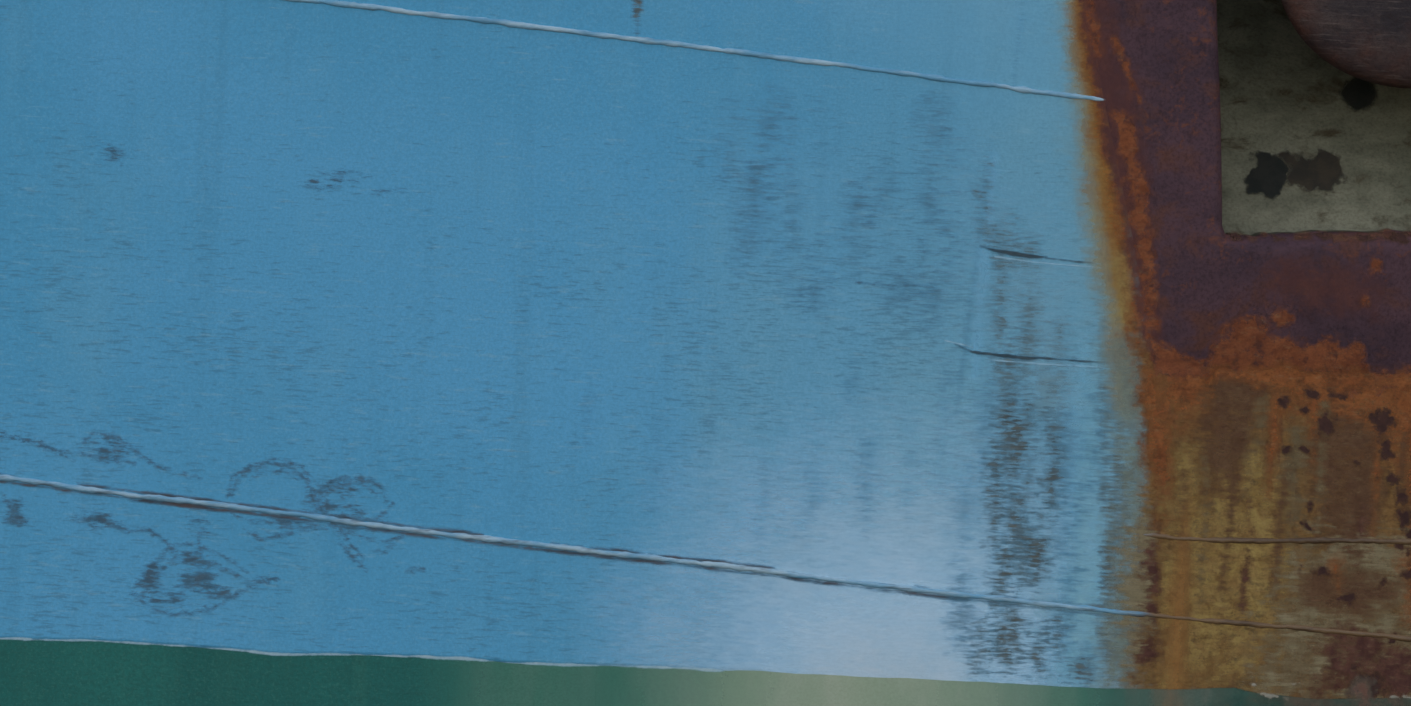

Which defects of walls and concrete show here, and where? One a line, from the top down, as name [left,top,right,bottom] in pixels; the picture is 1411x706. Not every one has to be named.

water stain [0,163,1411,706]
rust [1066,0,1411,706]
peeling [1244,149,1347,199]
peeling [1340,77,1378,112]